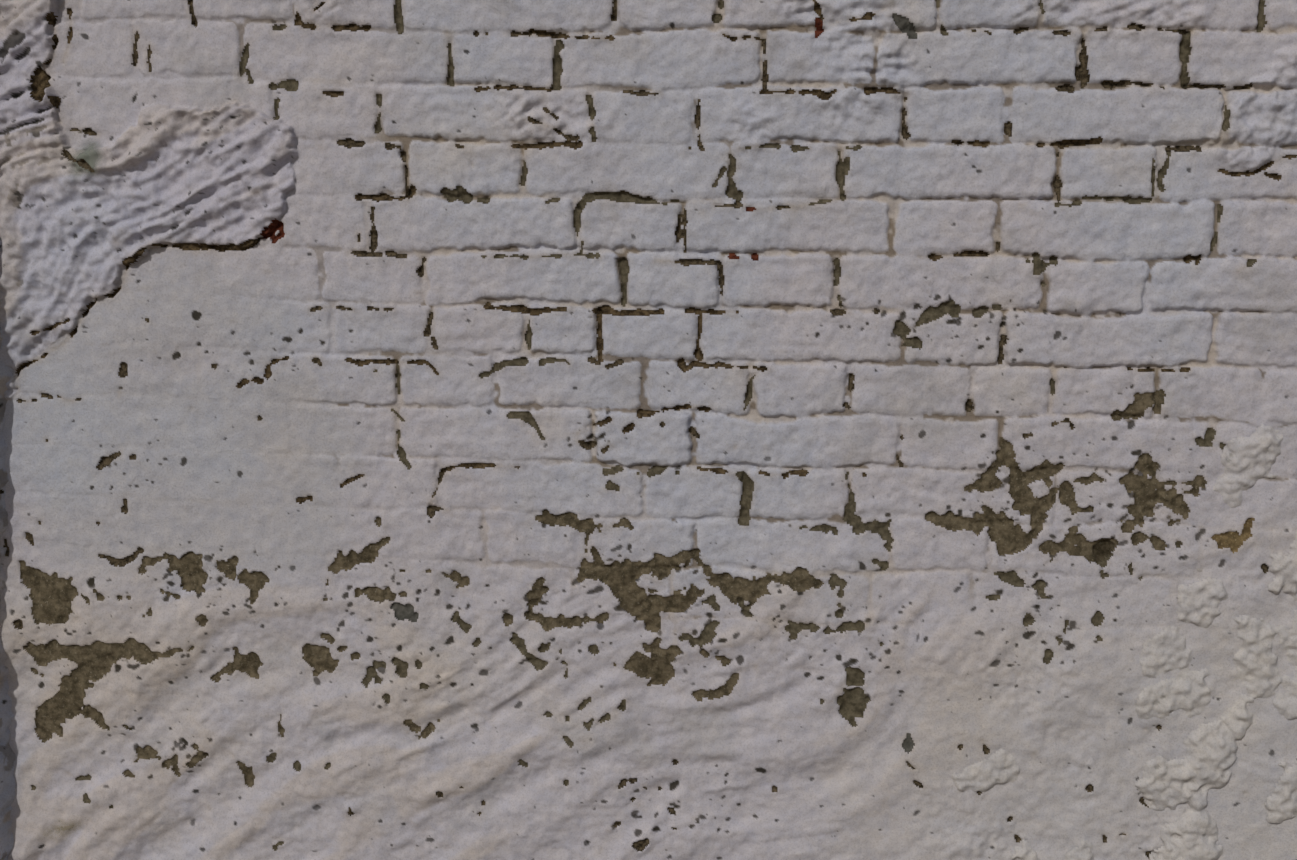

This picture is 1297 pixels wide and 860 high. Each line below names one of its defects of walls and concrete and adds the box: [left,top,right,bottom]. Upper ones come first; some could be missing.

flaking render [96,451,136,470]
peeling [1195,428,1226,451]
peeling [925,437,1207,601]
peeling [98,547,270,604]
peeling [3,539,194,743]
peeling [502,509,865,702]
peeling [1043,620,1069,664]
peeling [1091,611,1105,641]
peeling [210,647,264,683]
peeling [820,666,871,727]
peeling [122,743,209,778]
peeling [236,753,277,788]